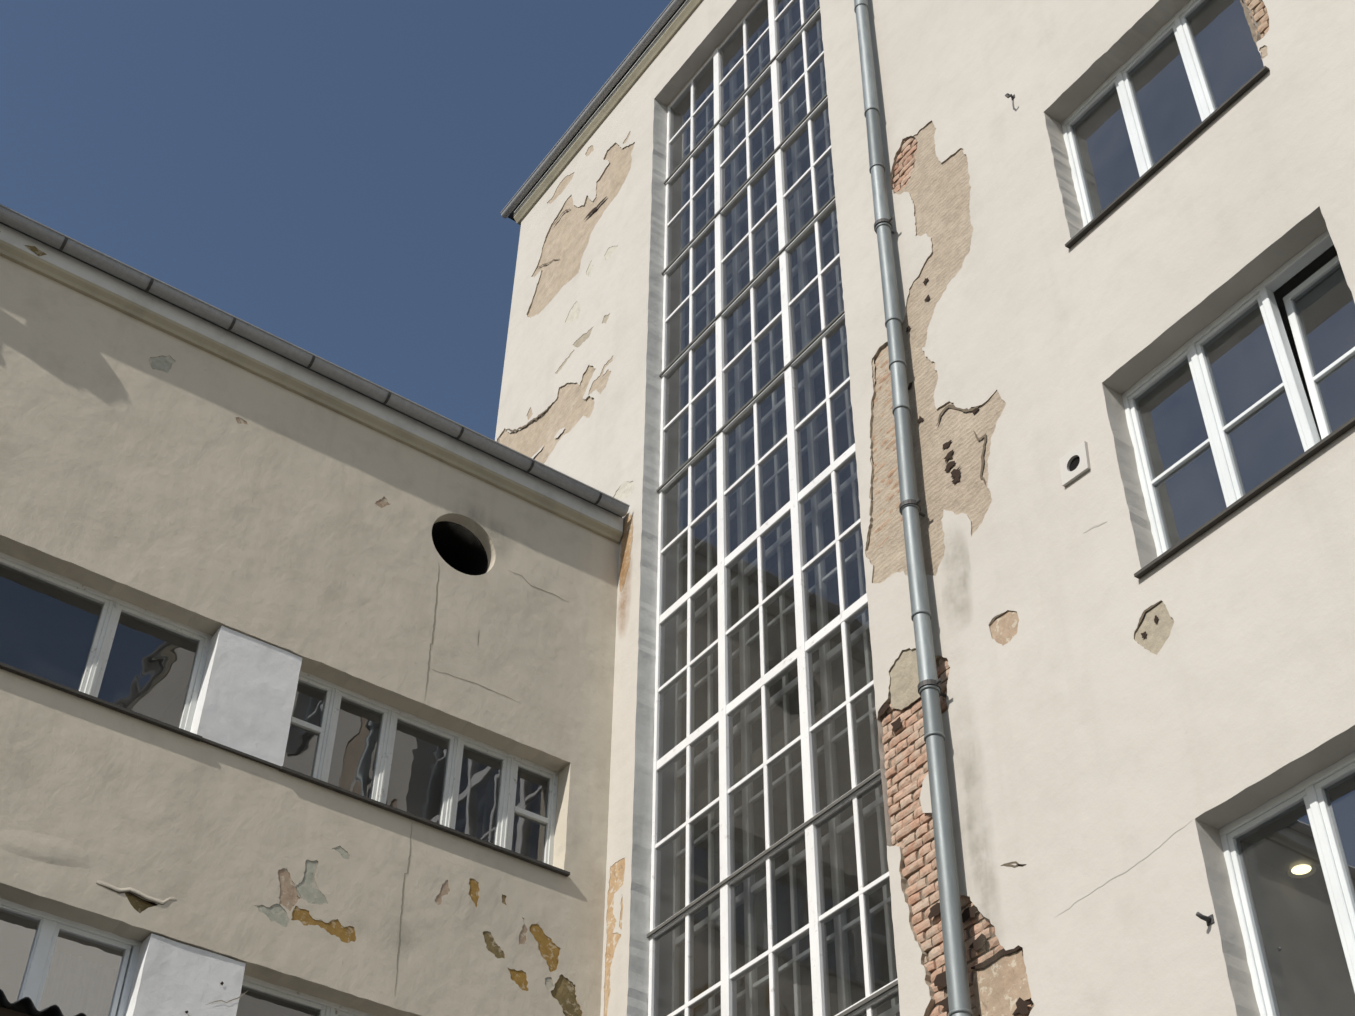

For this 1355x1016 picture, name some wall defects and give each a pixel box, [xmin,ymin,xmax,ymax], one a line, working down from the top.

flaking render [1240,0,1269,60]
flaking render [527,131,635,318]
flaking render [497,302,613,464]
flaking render [865,120,1006,583]
flaking render [989,610,1019,645]
flaking render [1134,600,1174,655]
peeling [255,860,356,943]
flaking render [874,648,950,1016]
crack [1054,820,1192,918]
peeling [483,931,529,991]
peeling [519,918,583,1016]
flaking render [960,895,1035,1016]